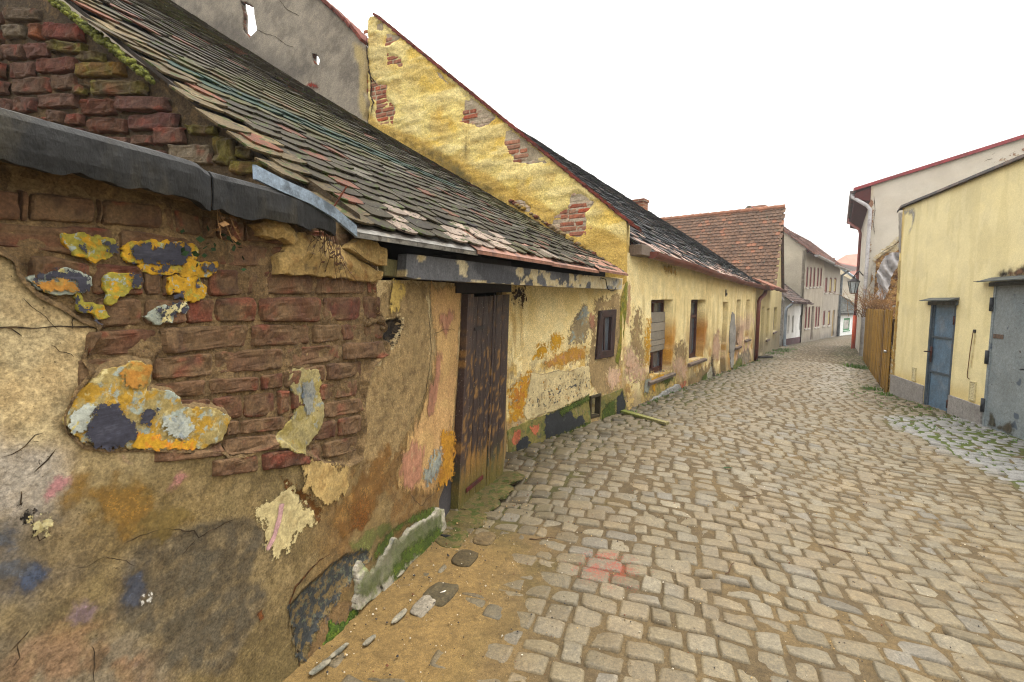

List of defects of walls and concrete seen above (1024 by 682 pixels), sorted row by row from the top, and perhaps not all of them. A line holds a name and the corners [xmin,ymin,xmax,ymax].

flaking render [367,80,395,125]
flaking render [460,95,496,128]
flaking render [504,130,547,164]
flaking render [552,193,594,237]
crack [0,299,94,357]
flaking render [0,163,461,560]
flaking render [507,293,688,452]